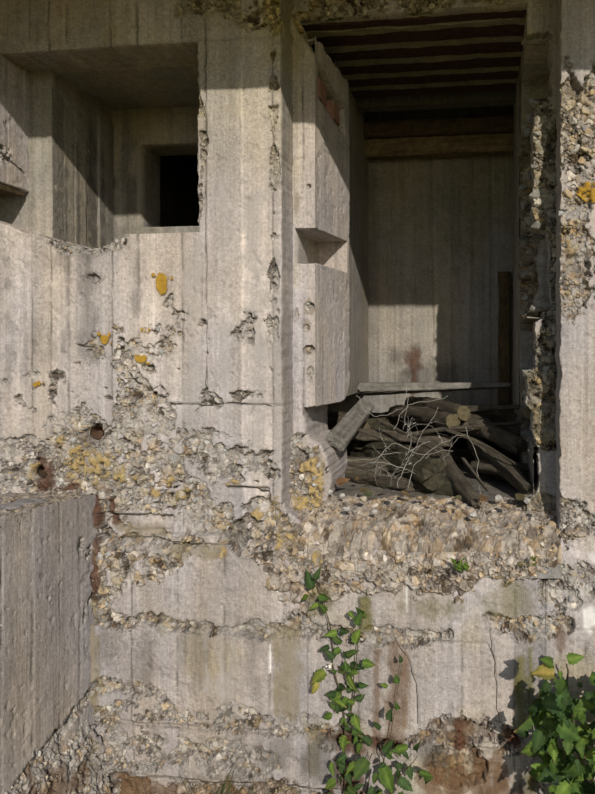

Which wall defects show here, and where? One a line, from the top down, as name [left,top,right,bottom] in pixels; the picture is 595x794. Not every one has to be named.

spalling [268,49,281,92]
spalling [171,0,524,54]
crack [0,150,24,173]
spalling [198,130,209,229]
spalling [268,103,281,193]
spalling [517,54,595,453]
spalling [230,256,282,349]
corrosion [36,457,80,492]
spalling [0,293,595,651]
crack [395,638,418,723]
crack [489,628,499,715]
spalling [3,675,525,794]